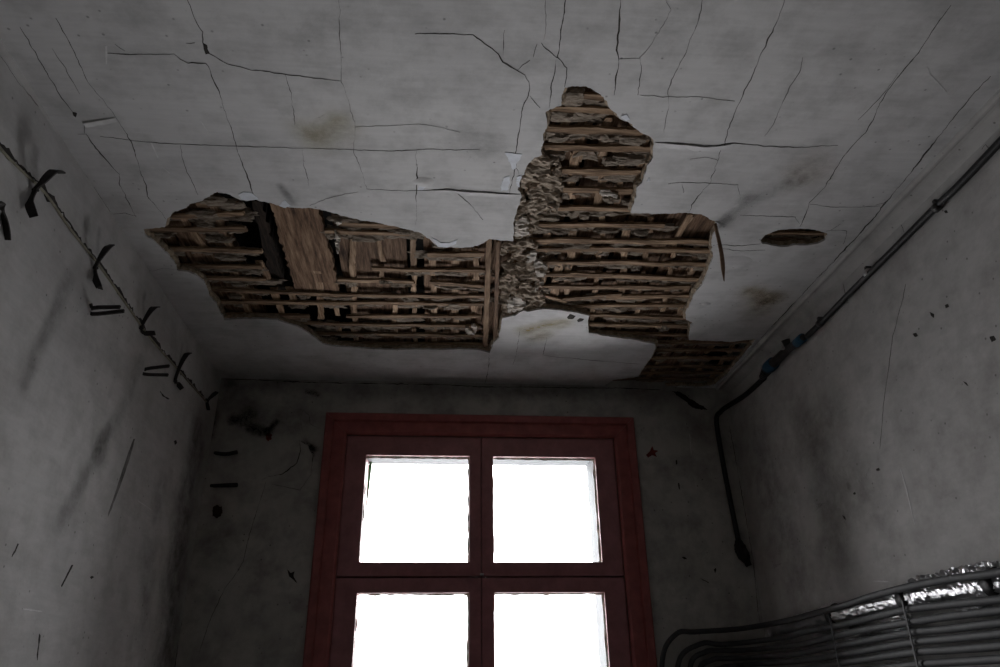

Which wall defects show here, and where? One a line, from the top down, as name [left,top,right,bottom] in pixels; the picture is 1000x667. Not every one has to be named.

crack [1,0,567,220]
spalling [144,110,659,372]
spalling [761,233,827,245]
crack [614,0,991,337]